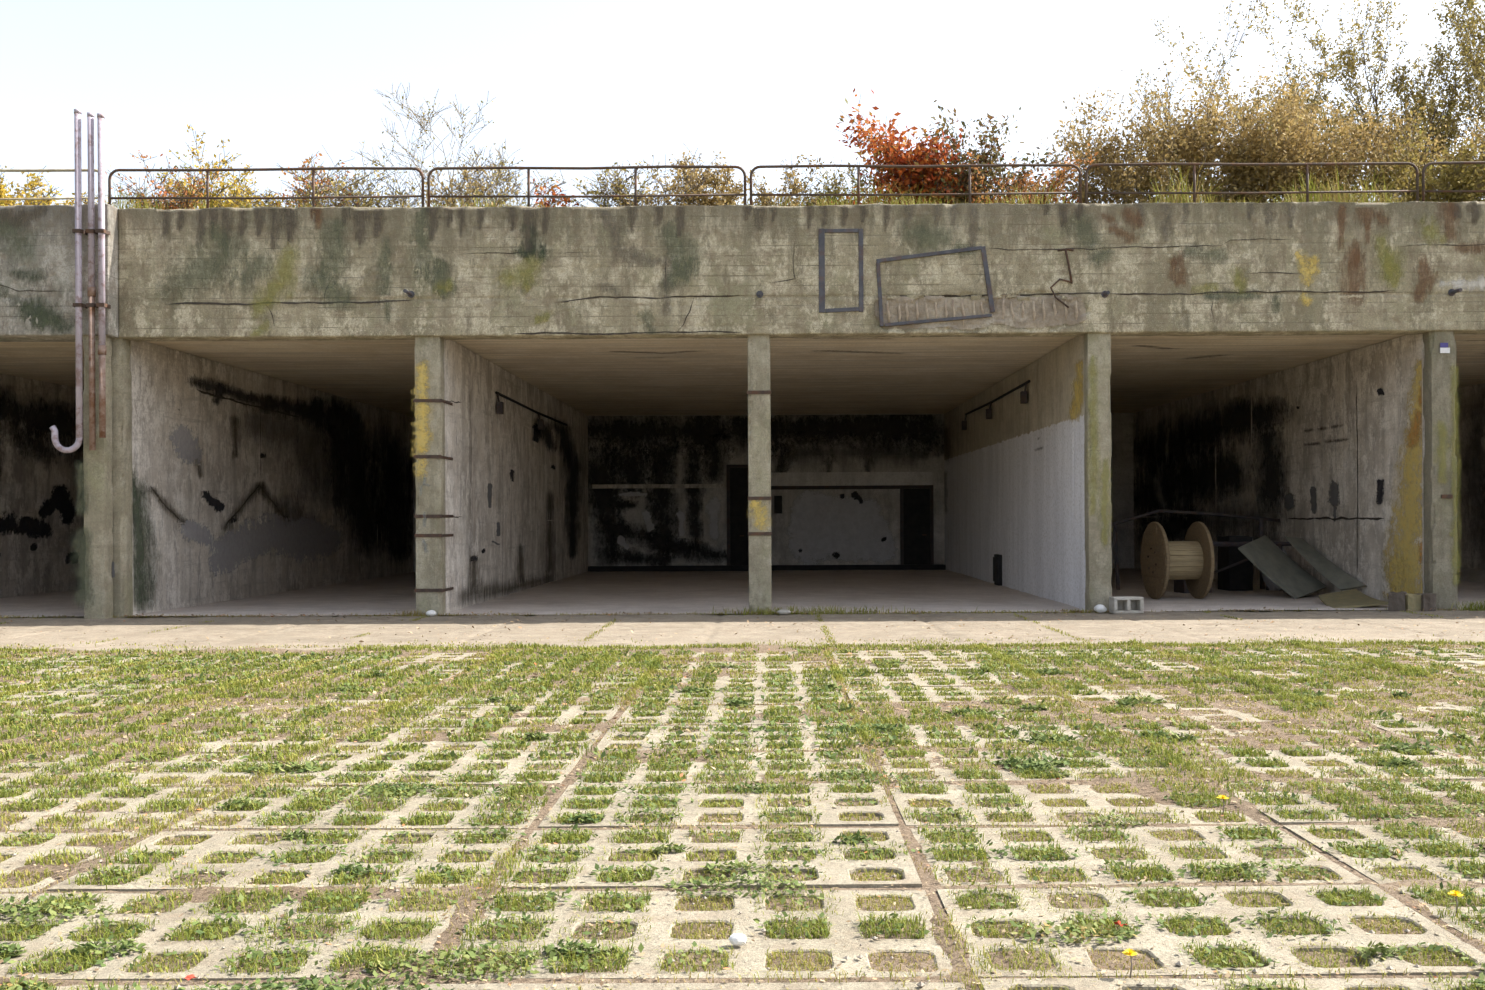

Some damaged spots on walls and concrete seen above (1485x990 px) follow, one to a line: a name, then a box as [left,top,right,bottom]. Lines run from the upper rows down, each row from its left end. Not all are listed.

leakage [0,207,47,227]
rust [1338,205,1388,303]
spalling [1050,248,1074,308]
spalling [875,294,995,330]
leakage [132,479,186,525]
leakage [224,483,291,530]